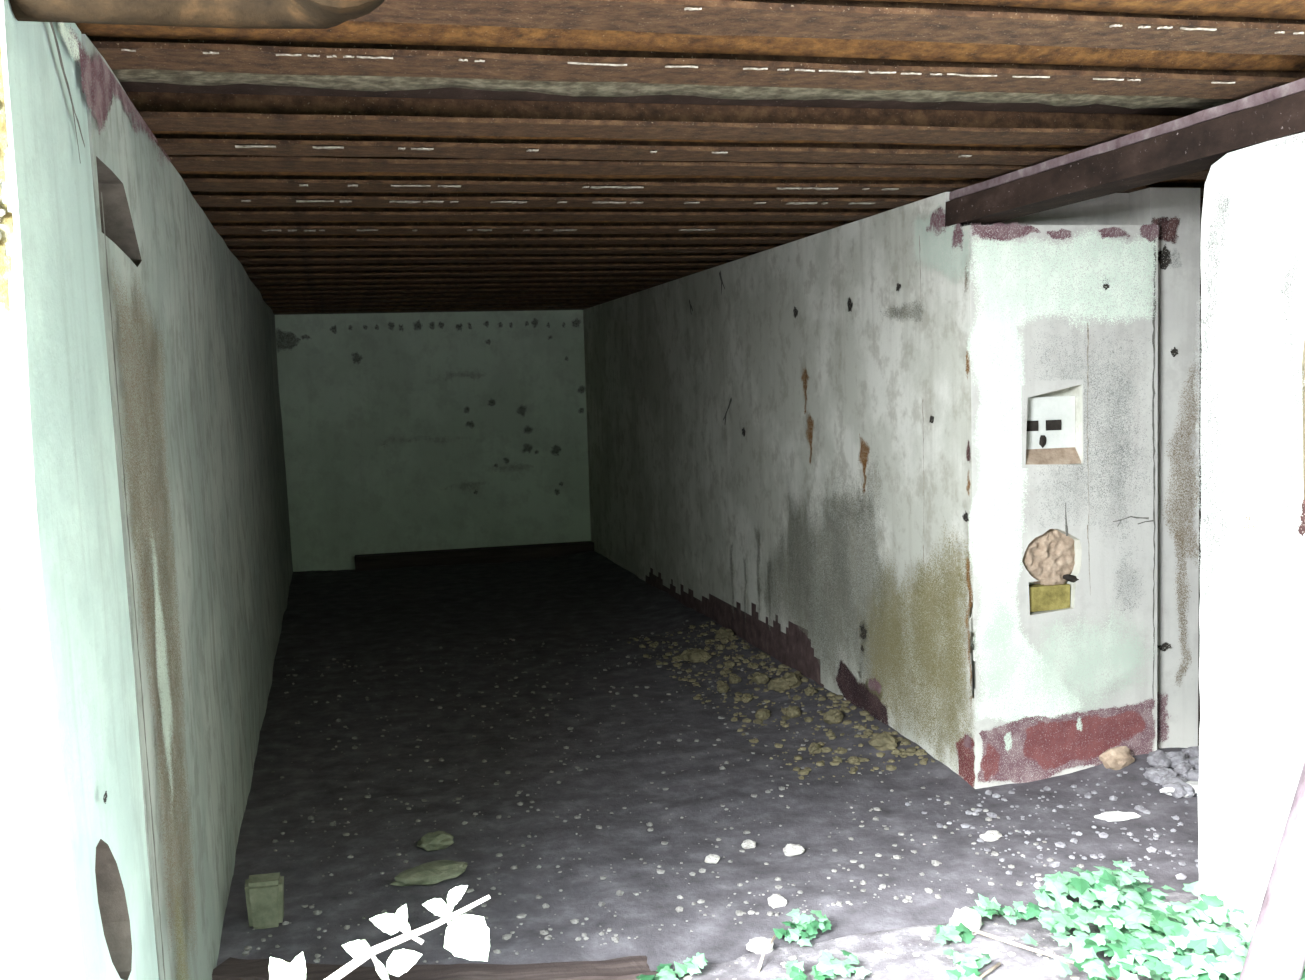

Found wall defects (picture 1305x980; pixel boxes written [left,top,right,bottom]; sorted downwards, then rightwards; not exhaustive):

spalling [645,568,888,725]
damp [729,454,977,781]
peeling [912,203,1183,787]